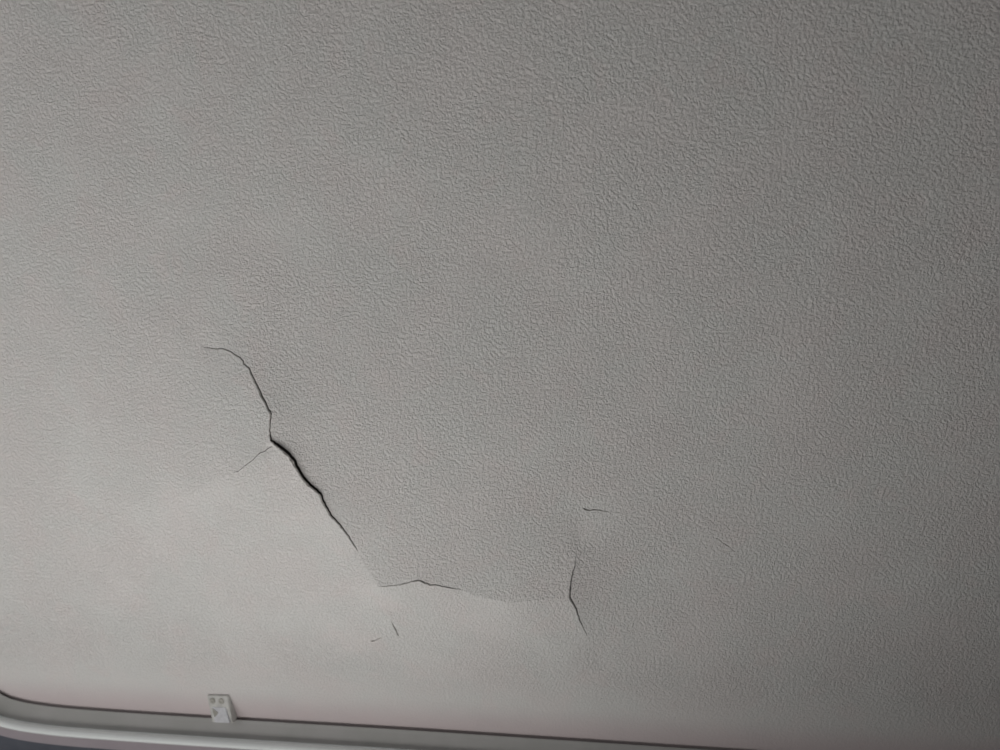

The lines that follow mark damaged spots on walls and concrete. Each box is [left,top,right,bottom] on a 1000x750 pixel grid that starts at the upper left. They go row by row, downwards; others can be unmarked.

crack [204,347,357,550]
crack [382,580,461,590]
crack [569,558,587,635]